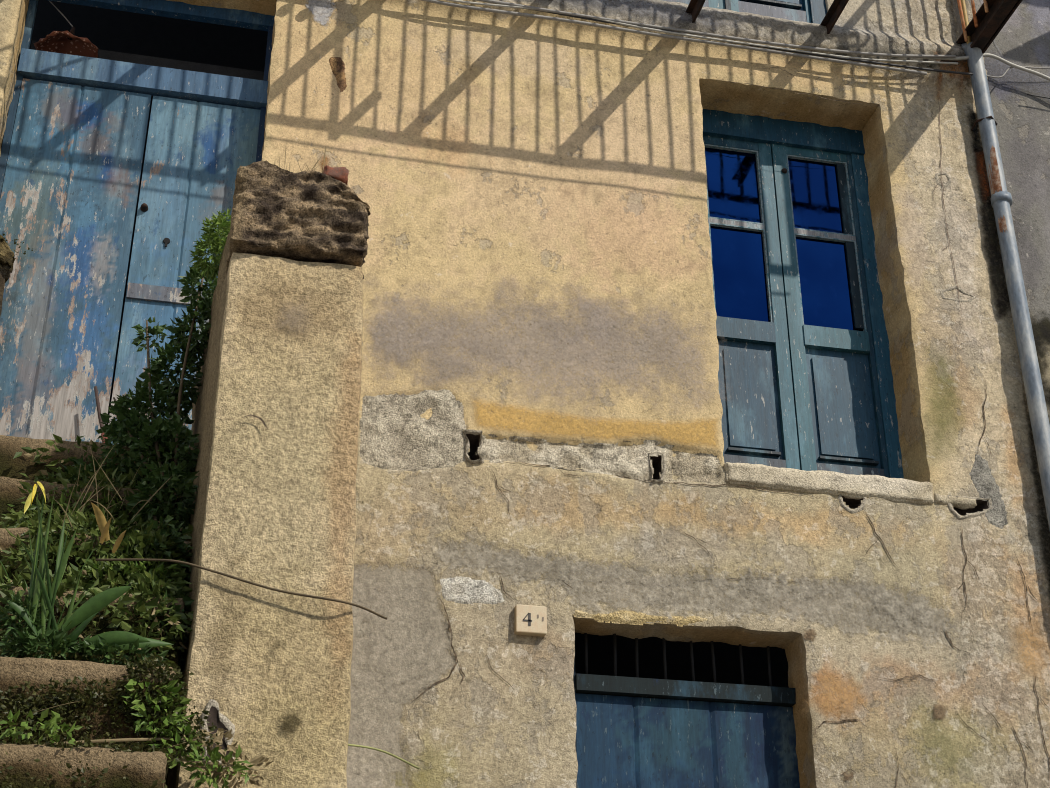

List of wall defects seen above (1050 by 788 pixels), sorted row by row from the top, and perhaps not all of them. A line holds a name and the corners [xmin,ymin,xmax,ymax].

rust [977,146,1002,196]
rust [998,215,1007,234]
damp [1031,317,1050,404]
spalling [359,389,721,484]
crack [976,376,991,455]
spalling [969,455,1008,529]
damp [1024,387,1050,597]
crack [864,515,897,566]
crack [945,530,979,654]
crack [408,597,465,707]
crack [873,673,939,681]
crack [1009,552,1050,788]